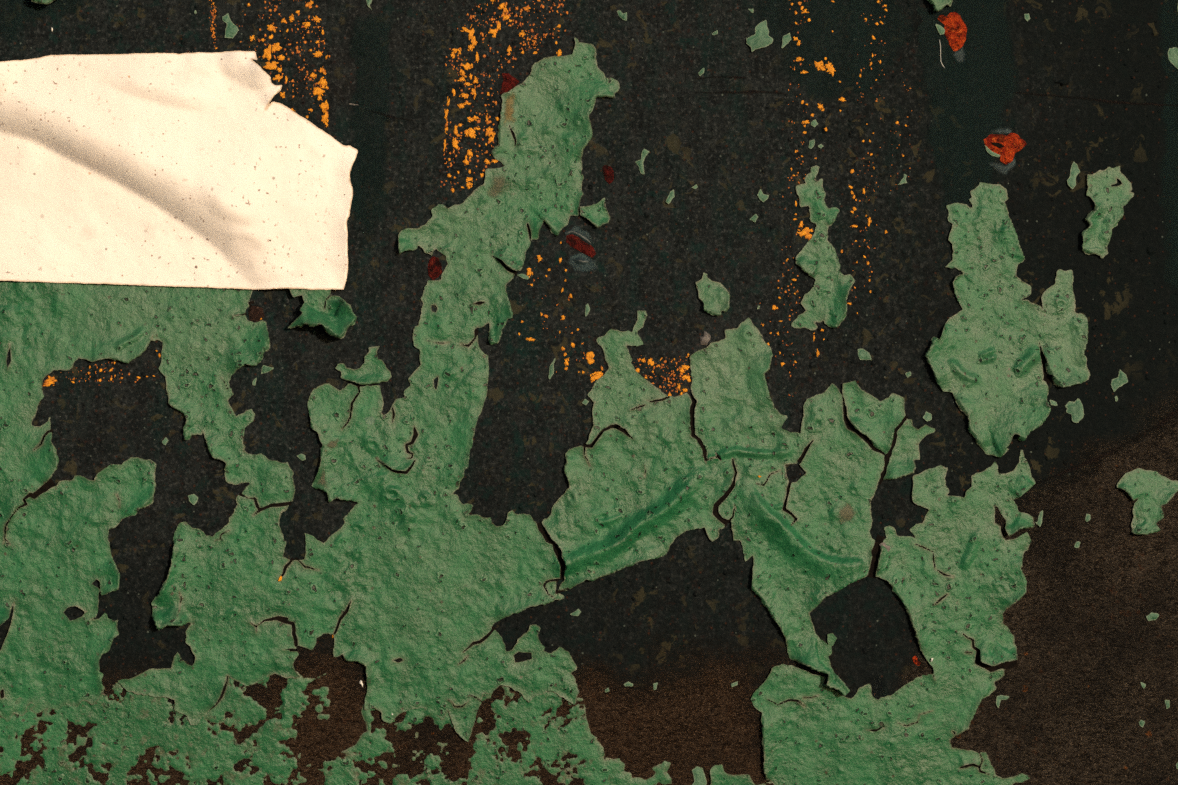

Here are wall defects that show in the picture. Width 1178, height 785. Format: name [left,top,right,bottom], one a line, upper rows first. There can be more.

corrosion [935,12,967,61]
corrosion [500,73,519,120]
corrosion [984,129,1026,173]
peeling [1111,370,1128,401]
peeling [0,38,672,785]
crack [583,395,813,527]
crack [843,407,909,485]
peeling [1116,468,1178,535]
crack [281,557,314,576]
peeling [542,310,1043,785]
crack [250,616,298,652]
crack [334,601,351,634]